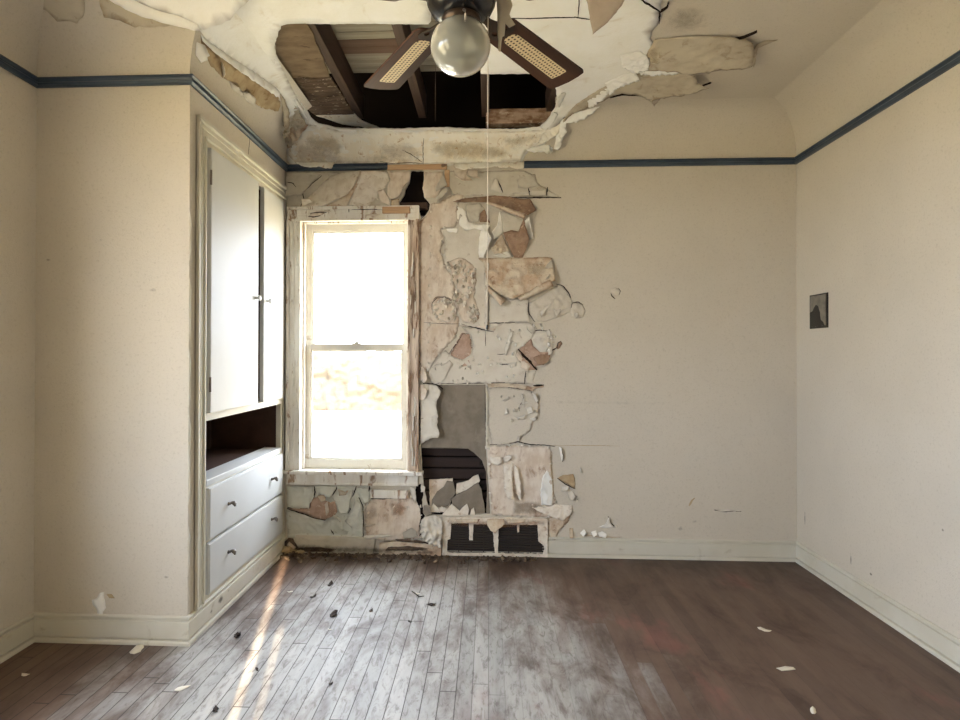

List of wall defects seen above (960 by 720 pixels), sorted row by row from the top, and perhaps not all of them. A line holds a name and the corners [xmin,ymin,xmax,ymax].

crack [642,0,669,24]
leakage [288,125,548,165]
flaking render [99,0,662,550]
peeling [92,592,114,614]